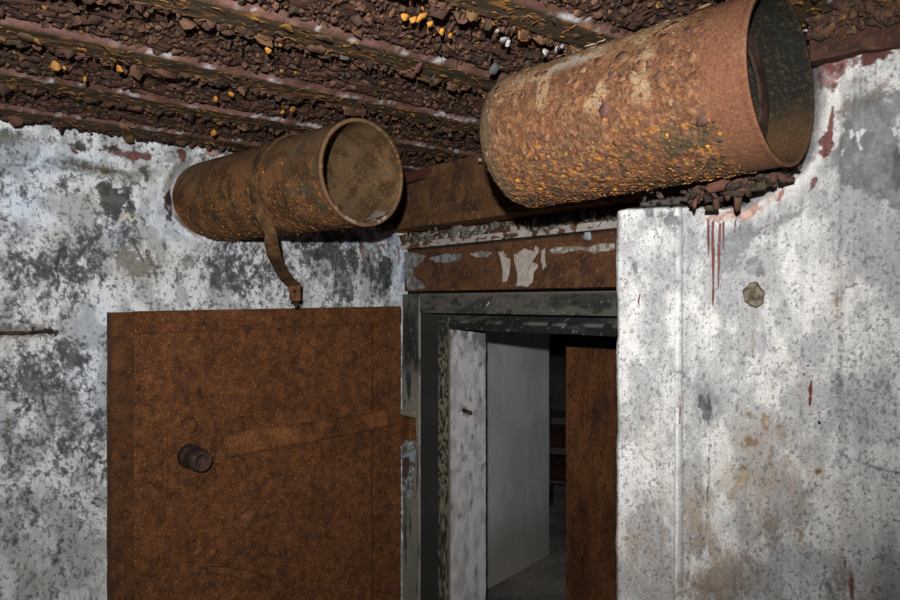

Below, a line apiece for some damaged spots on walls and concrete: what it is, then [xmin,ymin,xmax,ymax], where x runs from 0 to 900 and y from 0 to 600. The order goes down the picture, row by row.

corrosion [790,0,900,42]
corrosion [0,0,730,173]
water stain [0,129,21,146]
corrosion [819,107,834,158]
water stain [45,159,149,182]
water stain [115,239,155,278]
water stain [312,240,392,302]
peeling [399,208,618,290]
corrosion [642,164,803,305]
water stain [55,339,79,370]
water stain [58,400,95,441]